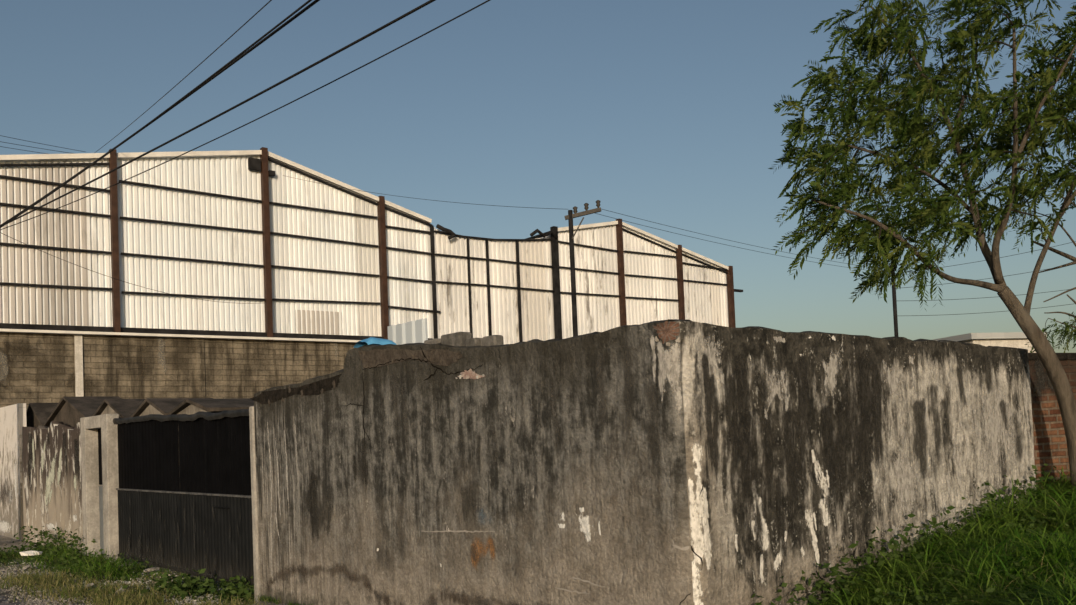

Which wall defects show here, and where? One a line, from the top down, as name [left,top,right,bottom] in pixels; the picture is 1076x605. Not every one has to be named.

crack [347,347,483,440]
spalling [456,369,484,379]
flaking render [650,321,682,412]
damp [63,432,79,481]
damp [267,421,297,536]
damp [305,473,334,541]
damp [278,564,396,605]
peeling [558,507,601,542]
crack [672,536,703,566]
damp [688,350,882,605]
damp [913,366,966,496]
damp [1000,400,1023,460]